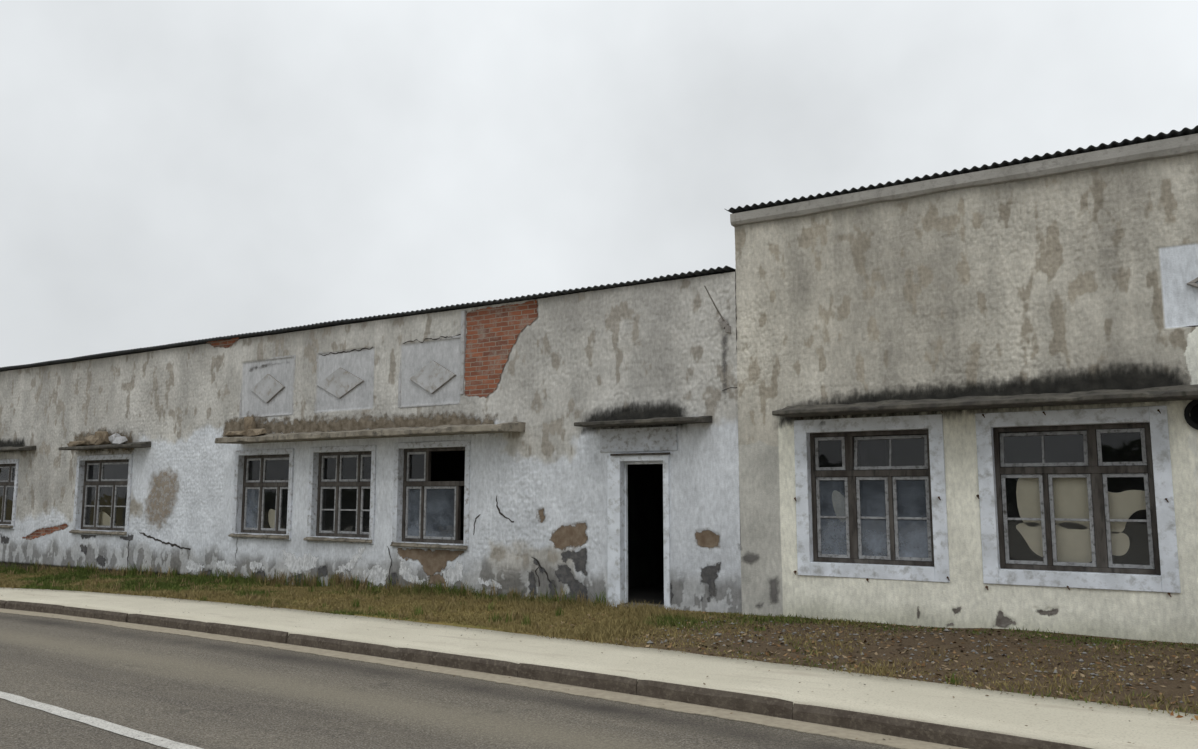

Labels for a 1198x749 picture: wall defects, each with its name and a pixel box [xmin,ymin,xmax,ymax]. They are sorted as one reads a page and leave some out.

flaking render [464,300,538,398]
flaking render [0,524,68,544]
peeling [80,535,106,568]
peeling [528,523,588,602]
flaking render [695,530,720,549]
peeling [701,562,721,602]
flaking render [996,611,1016,628]